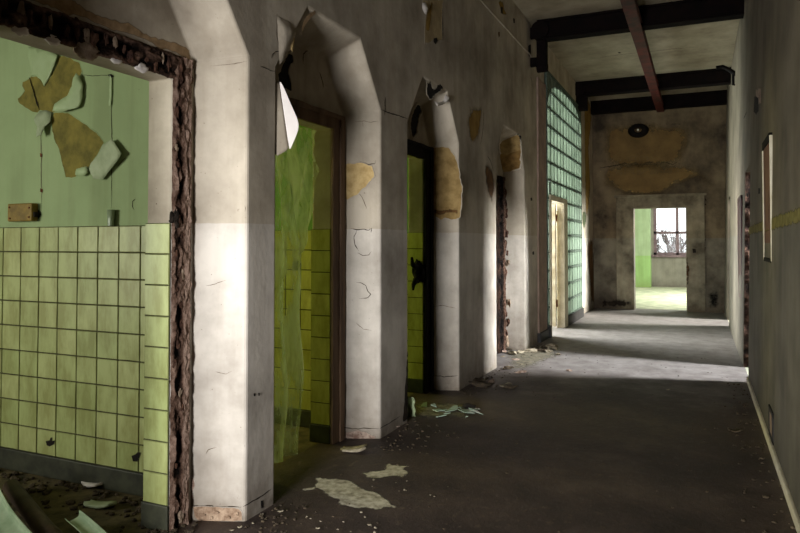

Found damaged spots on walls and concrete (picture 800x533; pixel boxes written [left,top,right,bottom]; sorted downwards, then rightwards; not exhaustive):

peeling [275,38,299,156]
spalling [408,81,449,140]
spalling [0,0,254,532]
peeling [345,162,375,209]
peeling [434,146,463,221]
spalling [497,134,522,354]